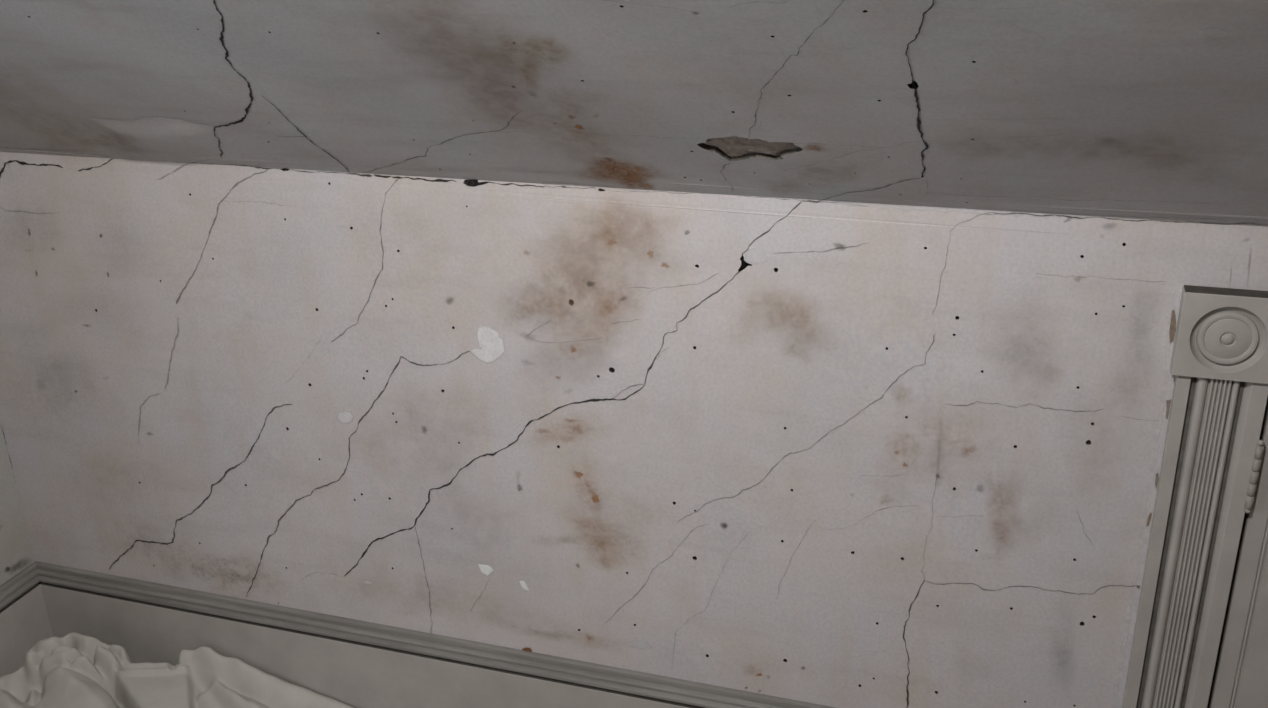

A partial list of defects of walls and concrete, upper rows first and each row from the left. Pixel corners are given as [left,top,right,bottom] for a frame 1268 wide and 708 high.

crack [201,0,518,182]
crack [345,0,934,576]
flaking render [697,136,803,161]
crack [989,212,1259,225]
crack [109,404,292,570]
crack [247,351,470,594]
crack [903,579,1137,708]